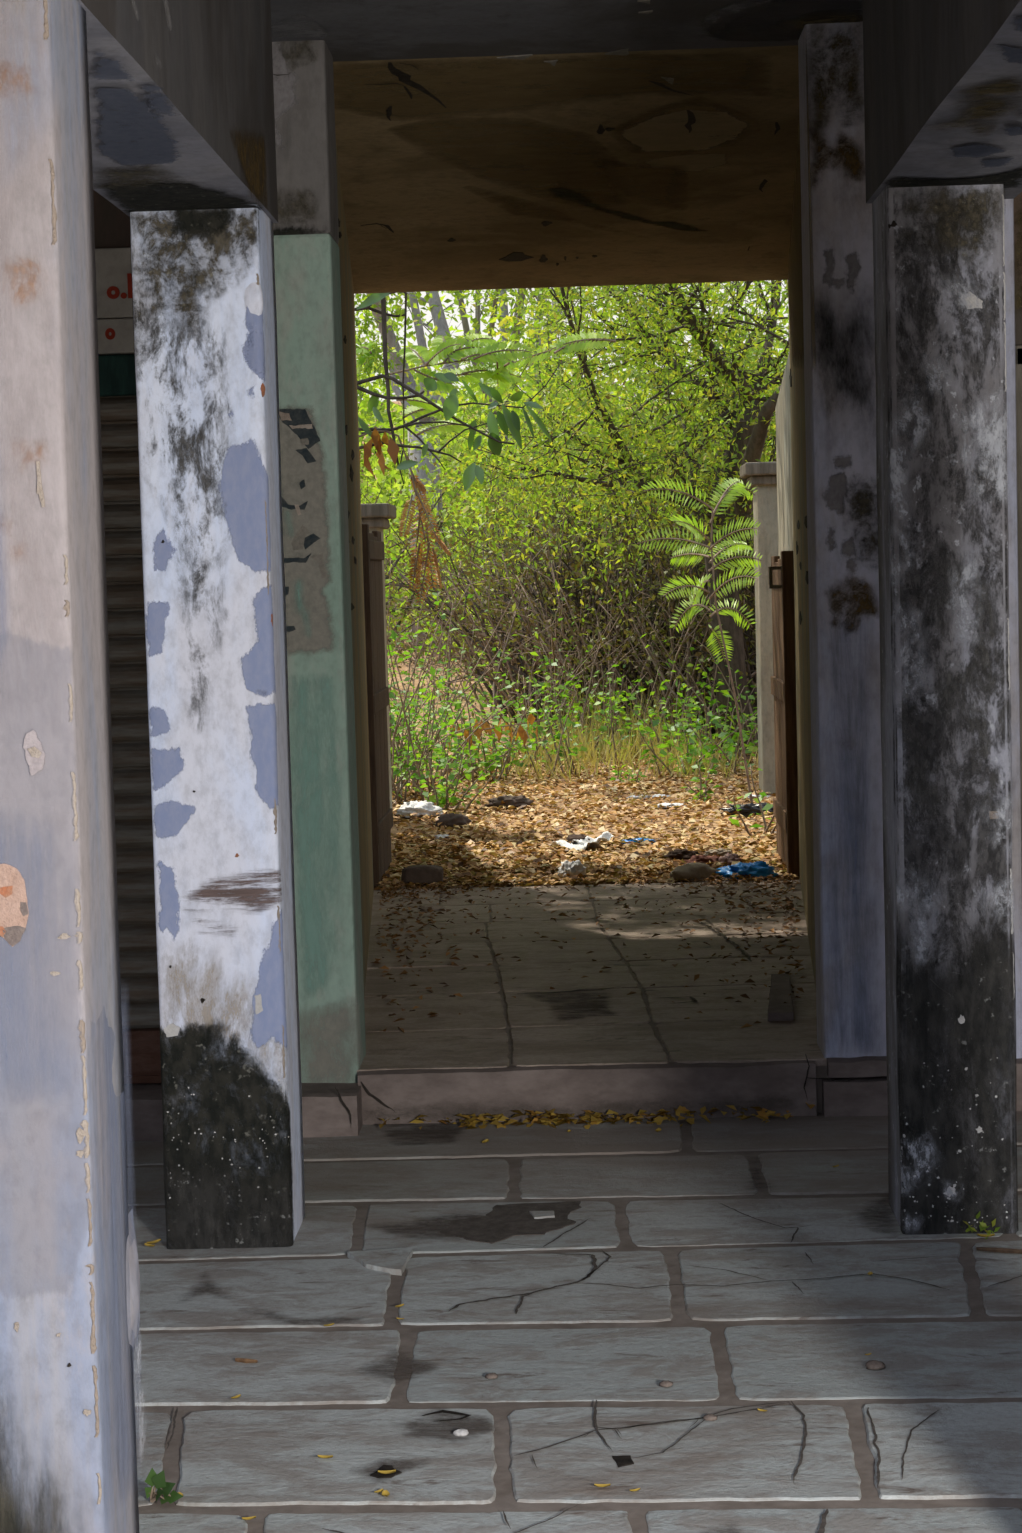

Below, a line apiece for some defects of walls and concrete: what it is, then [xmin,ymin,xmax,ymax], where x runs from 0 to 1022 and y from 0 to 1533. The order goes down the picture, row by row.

peeling [145,601,170,656]
damp [334,0,1022,1235]
peeling [149,707,196,838]
flaking render [0,863,29,947]
peeling [158,861,180,939]
peeling [250,906,287,1079]
damp [160,963,294,1250]
crack [449,1203,949,1314]
damp [0,1426,62,1533]
crack [514,1400,807,1483]
crack [818,1509,829,1533]
crack [867,1407,938,1488]